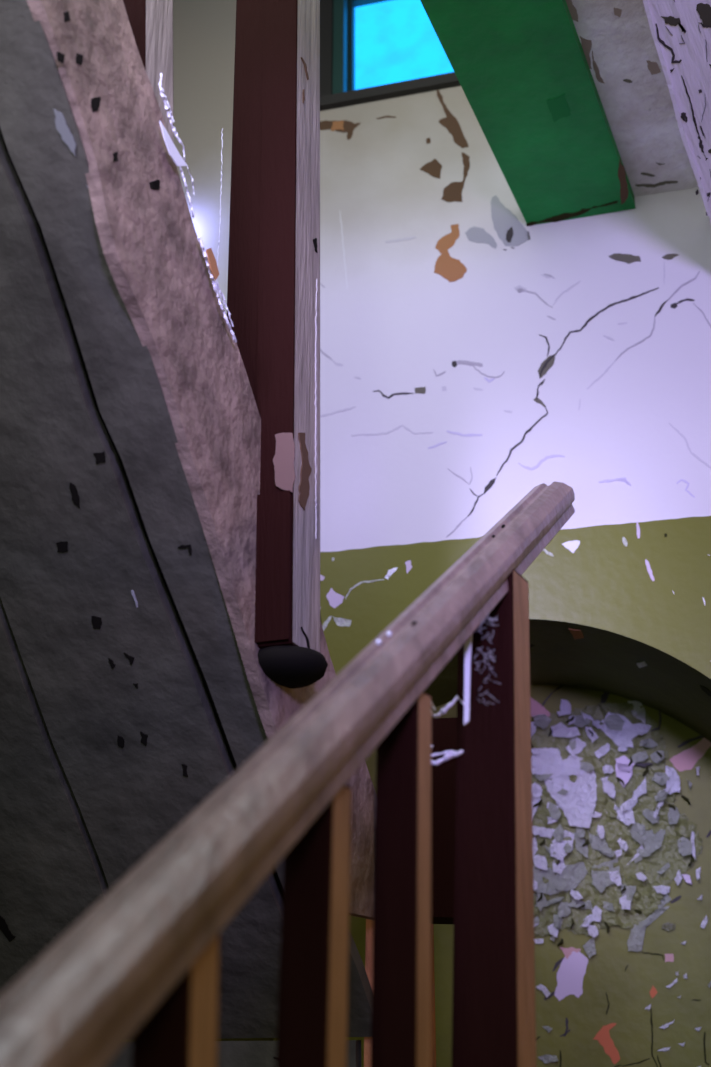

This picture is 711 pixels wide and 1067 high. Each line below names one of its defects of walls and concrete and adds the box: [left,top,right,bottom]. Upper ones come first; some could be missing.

flaking render [661,16,684,32]
flaking render [696,3,711,28]
flaking render [420,159,442,179]
flaking render [465,227,513,249]
flaking render [609,253,641,264]
peeling [273,279,318,539]
crack [446,262,711,538]
peeling [320,560,412,631]
peeling [530,692,711,1001]
peeling [645,954,687,1010]
peeling [538,1055,558,1063]
peeling [593,1023,620,1064]